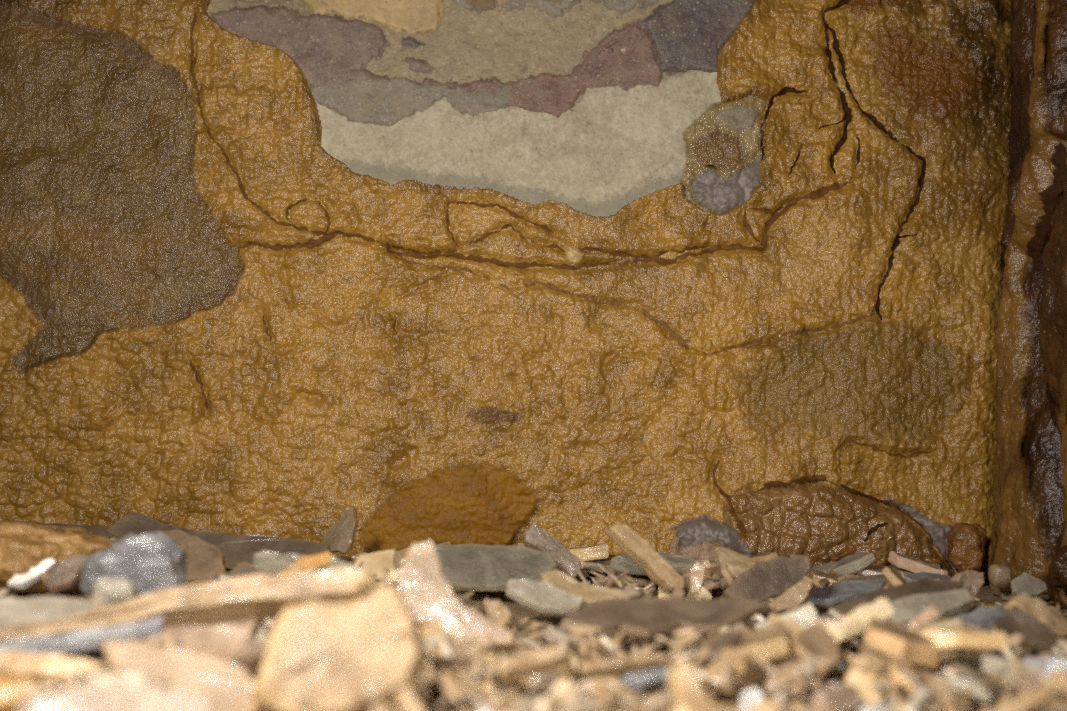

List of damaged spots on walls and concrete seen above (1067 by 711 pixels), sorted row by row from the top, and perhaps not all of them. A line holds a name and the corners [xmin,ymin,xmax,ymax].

damp [0,5,244,373]
spalling [206,0,766,218]
crack [190,0,926,355]